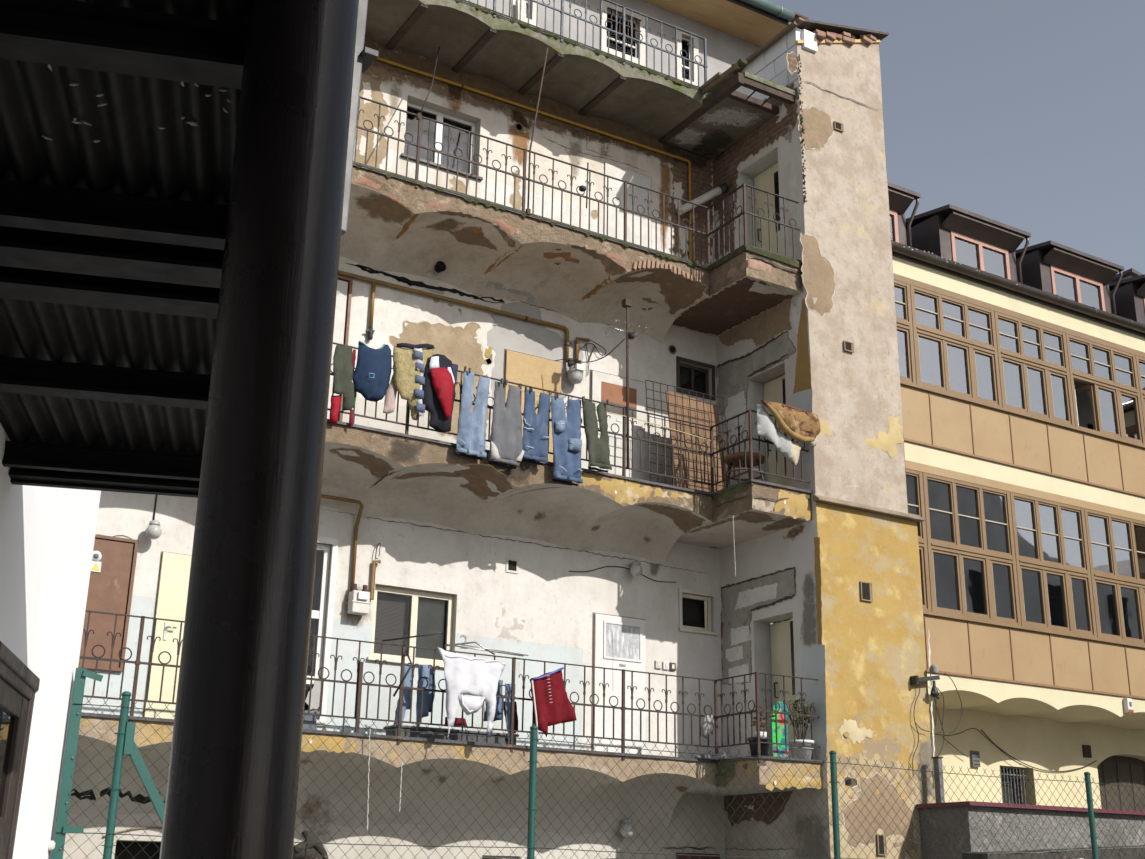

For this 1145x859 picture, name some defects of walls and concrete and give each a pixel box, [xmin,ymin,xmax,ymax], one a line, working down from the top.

peeling [353,72,389,190]
peeling [449,176,466,194]
spalling [427,202,524,251]
flaking render [543,51,844,415]
spalling [434,261,446,273]
crack [347,247,626,314]
flaking render [389,299,494,440]
spalling [329,447,517,503]
spalling [581,473,811,534]
spalling [860,581,873,602]
flaking render [839,718,874,744]
flaking render [724,776,823,827]